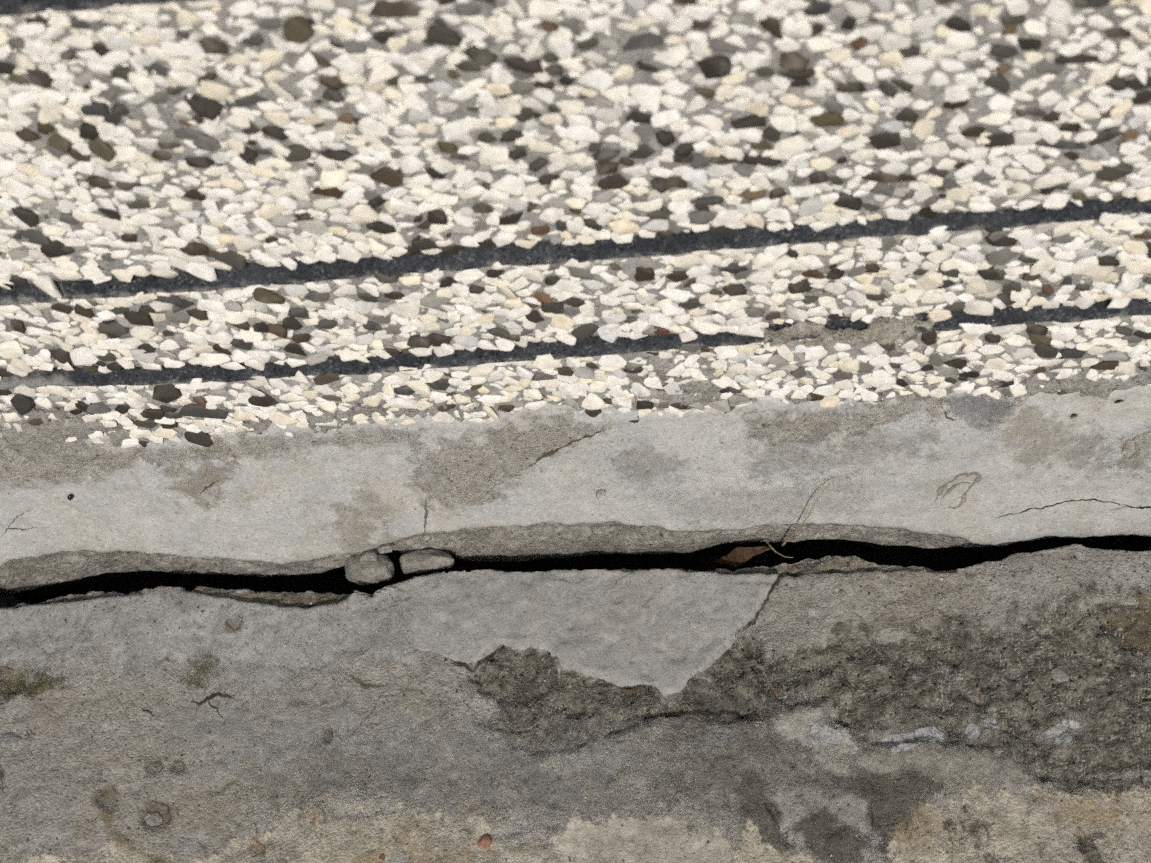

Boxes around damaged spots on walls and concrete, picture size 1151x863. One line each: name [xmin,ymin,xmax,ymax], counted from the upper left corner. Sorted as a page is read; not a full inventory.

crack [0,499,1151,605]
spalling [382,557,1151,863]
peeling [26,789,825,863]